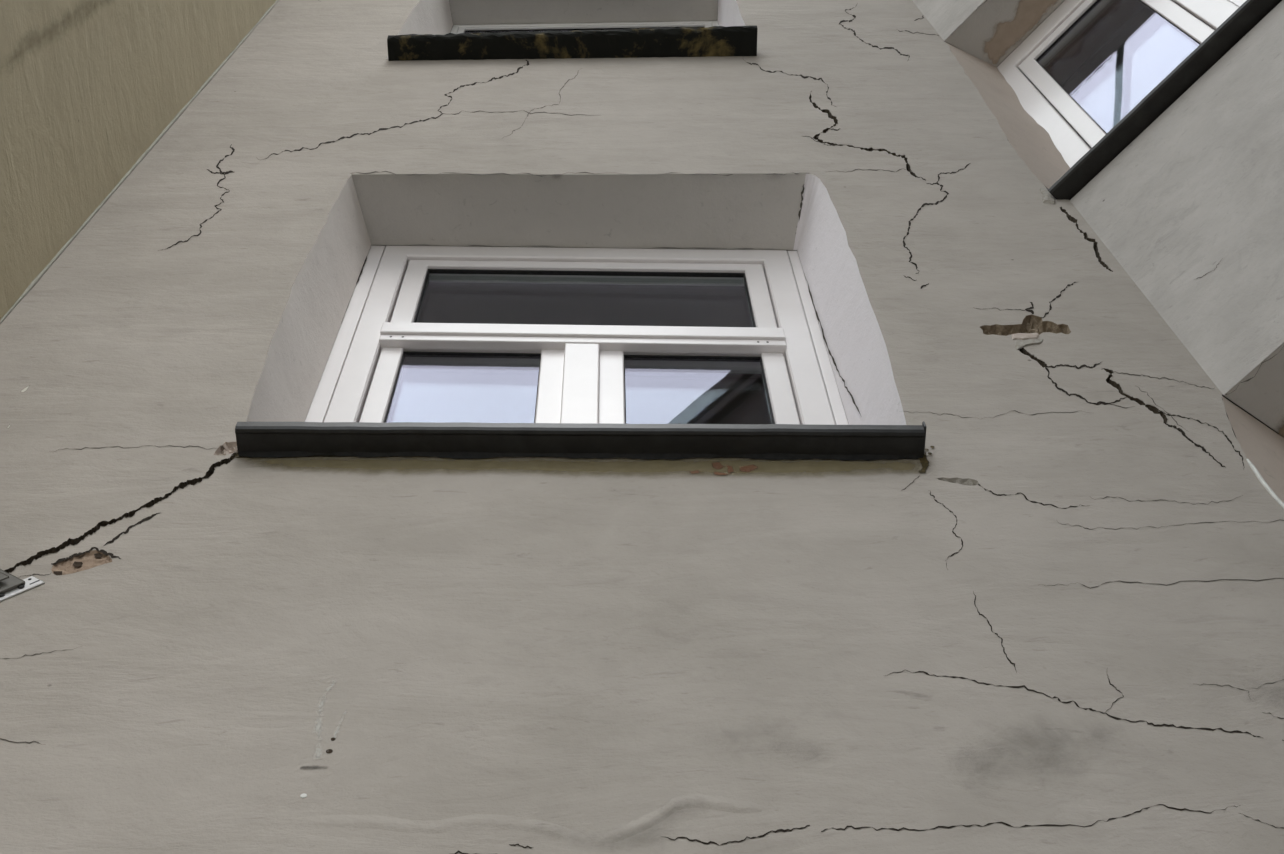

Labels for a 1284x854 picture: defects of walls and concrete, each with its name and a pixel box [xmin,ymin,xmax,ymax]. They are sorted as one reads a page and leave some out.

peeling [984,0,1057,64]
crack [158,60,591,251]
crack [744,60,971,289]
crack [976,207,1113,318]
flaking render [980,315,1071,350]
crack [899,346,1284,530]
flaking render [51,550,112,575]
crack [4,445,239,576]
crack [901,476,963,570]
crack [1044,578,1284,588]
crack [885,591,1284,741]
crack [660,804,1284,846]